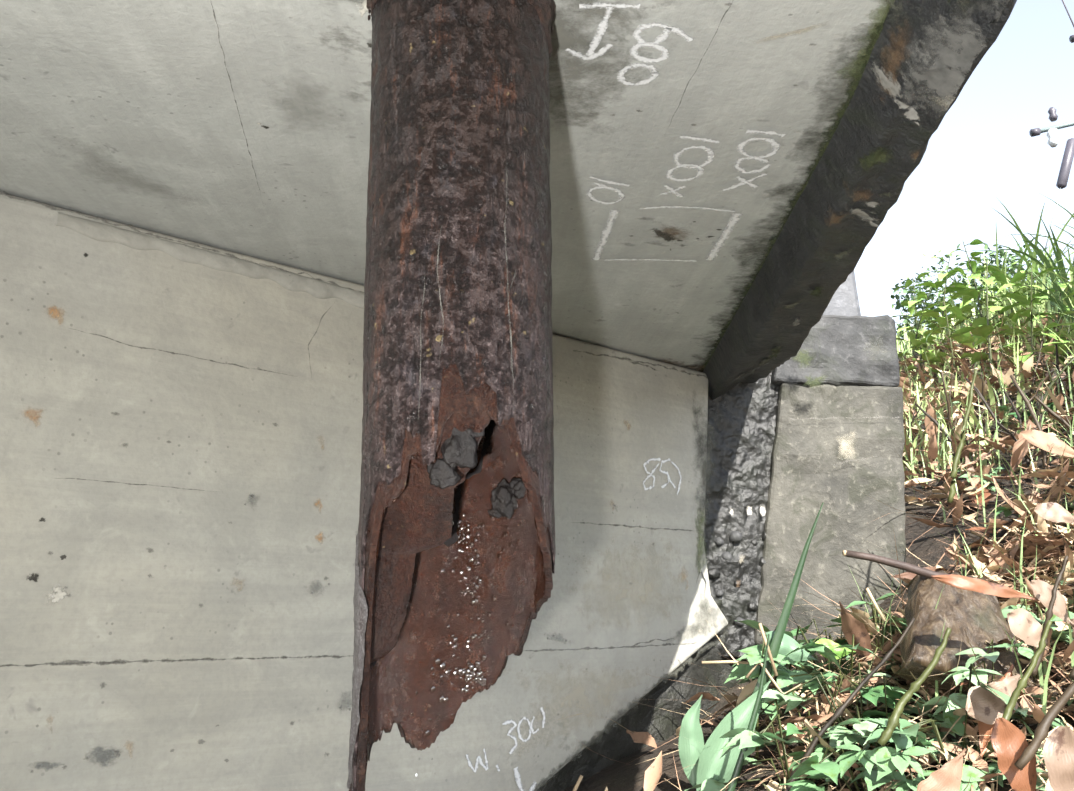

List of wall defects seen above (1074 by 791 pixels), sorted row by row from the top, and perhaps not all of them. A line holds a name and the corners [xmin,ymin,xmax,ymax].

water stain [549,0,626,119]
water stain [665,25,883,372]
peeling [370,409,492,664]